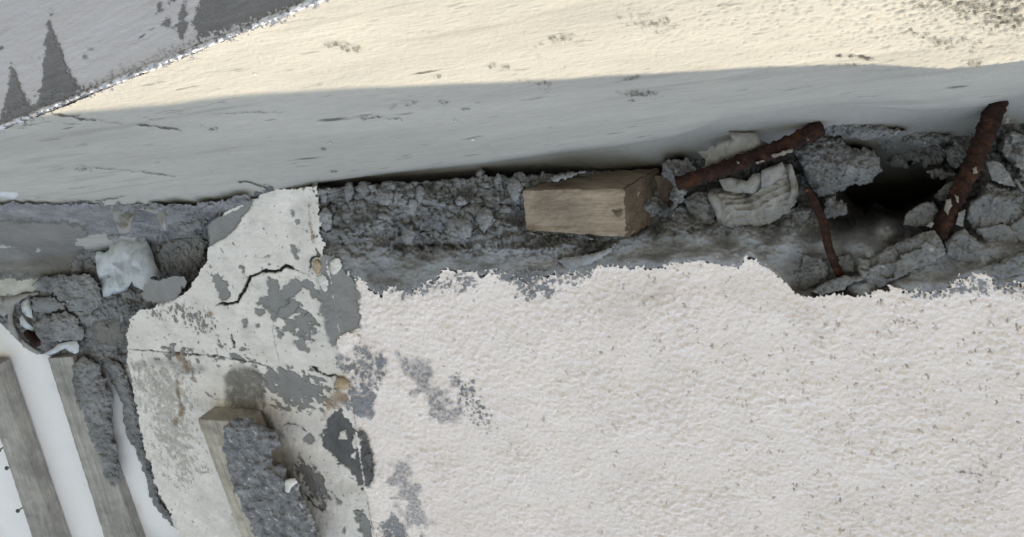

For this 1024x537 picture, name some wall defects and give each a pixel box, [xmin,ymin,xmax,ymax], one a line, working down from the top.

peeling [0,0,329,130]
spalling [926,100,1024,239]
spalling [803,186,844,277]
crack [219,256,320,305]
peeling [384,263,592,301]
peeling [911,272,1024,300]
spalling [0,186,492,490]
peeling [294,457,342,511]